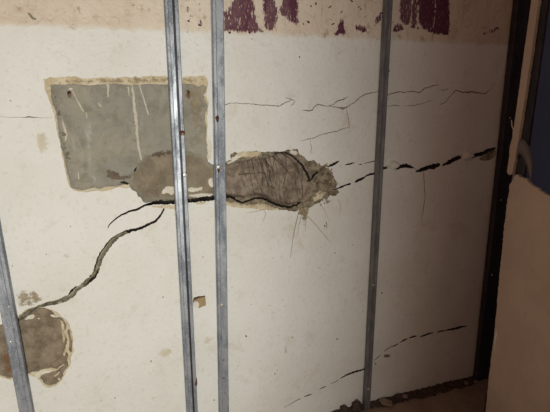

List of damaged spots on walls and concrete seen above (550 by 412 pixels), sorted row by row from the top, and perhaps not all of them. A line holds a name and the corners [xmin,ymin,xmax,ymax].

spalling [43,76,175,210]
spalling [182,75,214,205]
crack [225,84,493,149]
crack [188,194,301,208]
spalling [226,149,341,258]
crack [274,147,496,220]
spalling [0,325,13,380]
spalling [17,307,74,388]
crack [284,368,364,408]
crack [375,326,466,360]